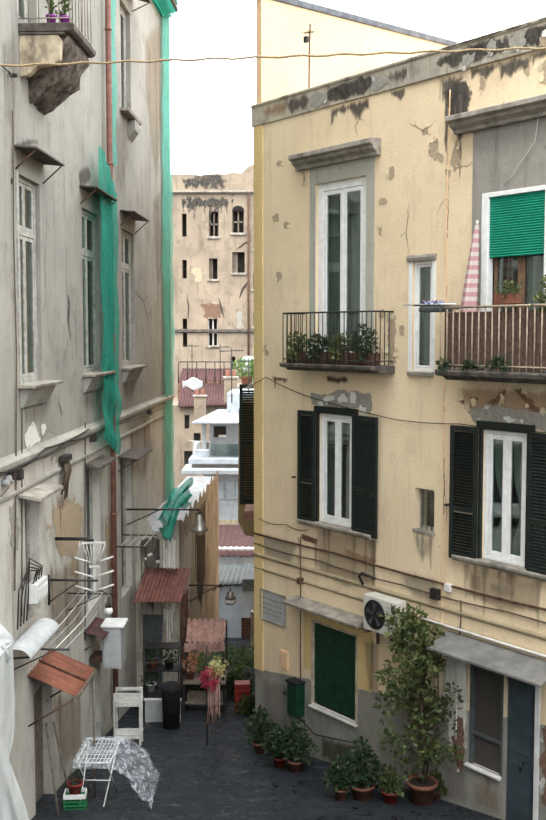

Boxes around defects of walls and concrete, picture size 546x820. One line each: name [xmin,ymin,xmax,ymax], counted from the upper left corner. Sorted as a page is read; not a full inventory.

flaking render [508,29,526,53]
water stain [288,95,308,113]
water stain [327,76,372,124]
water stain [389,68,407,100]
flaking render [462,52,475,71]
water stain [437,17,546,150]
flaking render [525,60,546,84]
flaking render [422,127,461,177]
flaking render [200,301,222,319]
flaking render [310,390,372,416]
flaking render [460,386,546,432]
flaking render [47,493,83,577]